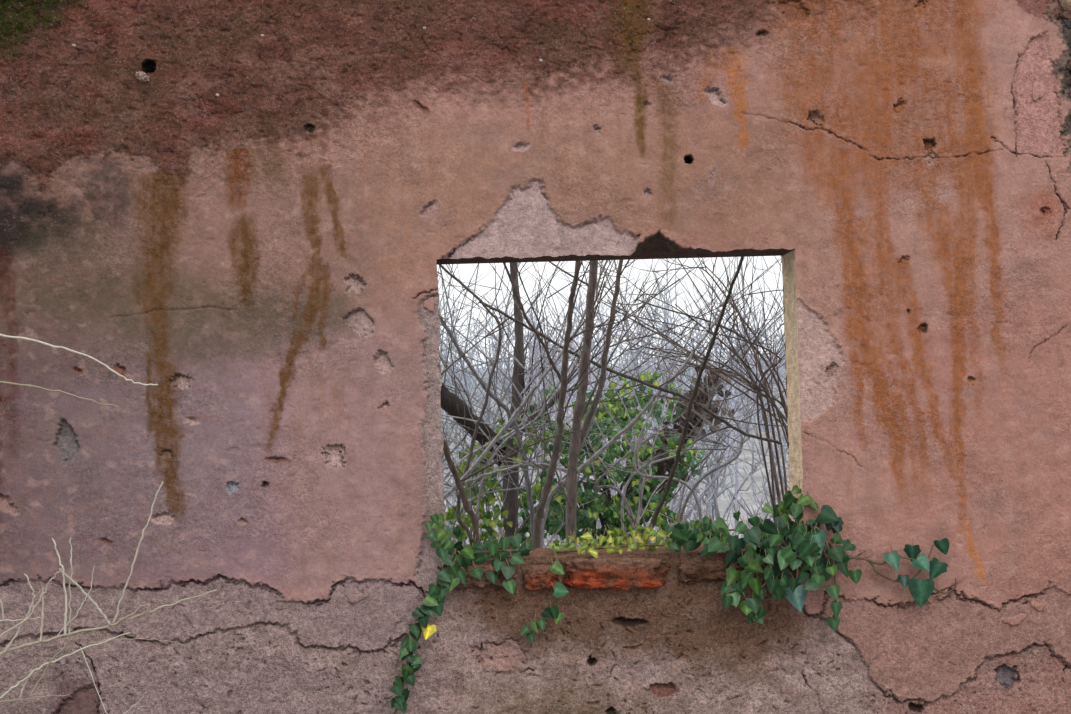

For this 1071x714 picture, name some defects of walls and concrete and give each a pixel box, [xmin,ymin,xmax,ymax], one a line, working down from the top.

damp [0,142,371,532]
flaking render [440,177,695,259]
damp [604,0,687,235]
corrosion [692,0,1071,590]
crack [740,52,1071,241]
flaking render [1011,0,1071,180]
flaking render [0,291,1071,714]
crack [52,642,102,714]
crack [480,640,538,677]
crack [800,667,825,714]